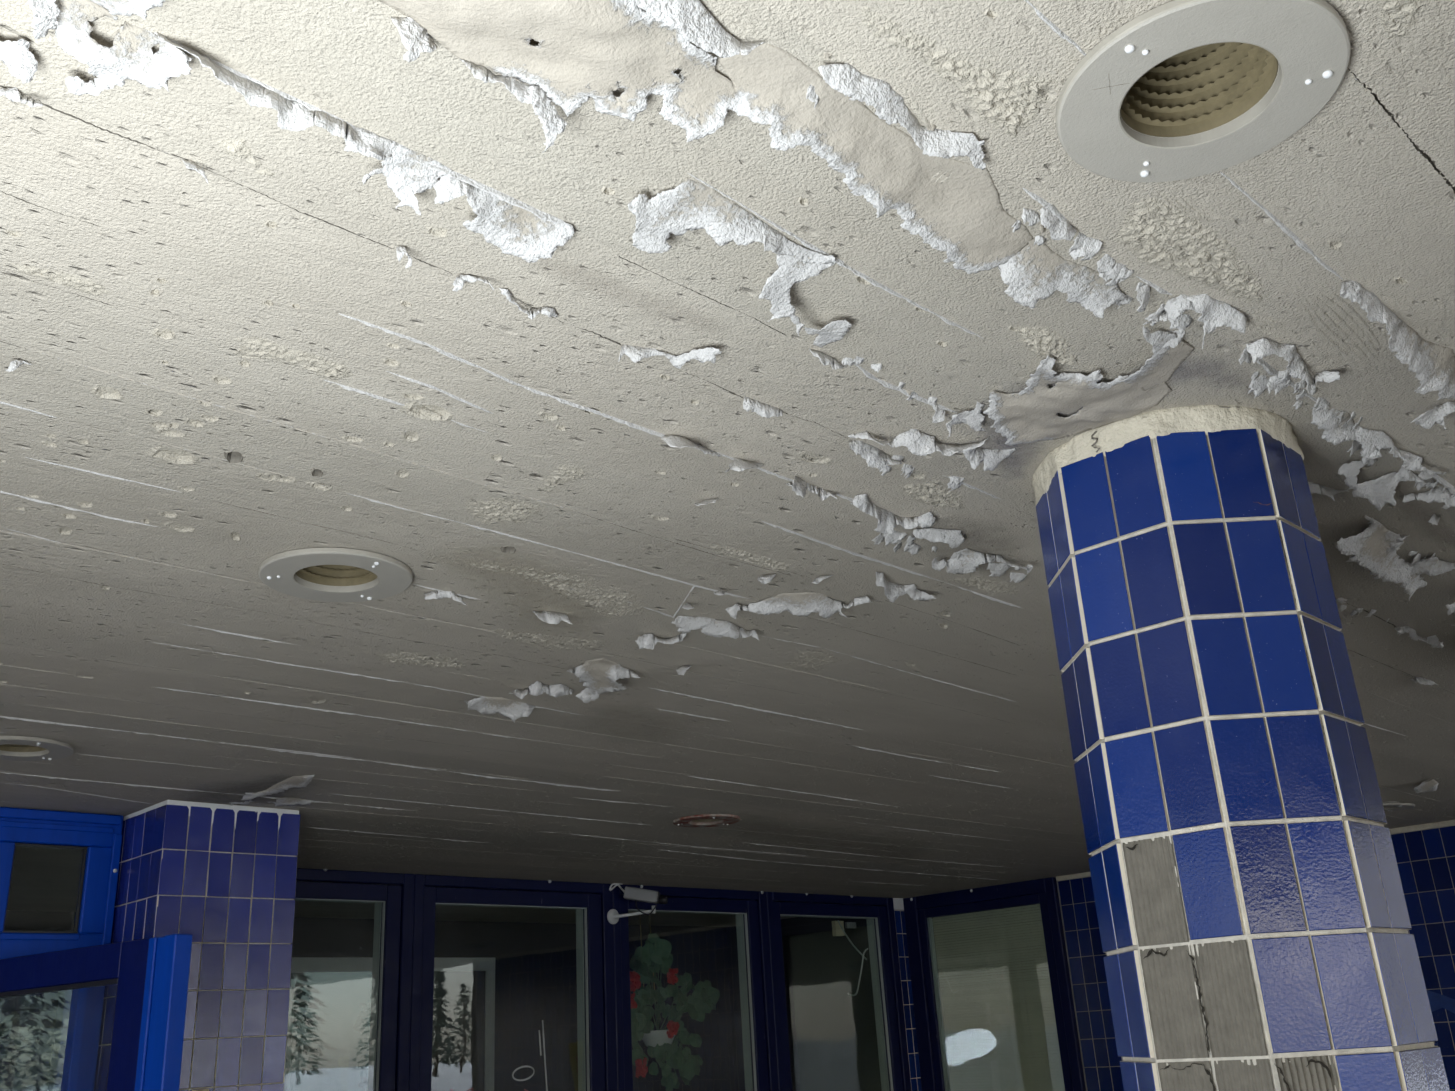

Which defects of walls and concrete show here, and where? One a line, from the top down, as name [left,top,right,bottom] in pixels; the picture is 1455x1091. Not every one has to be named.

peeling [0,0,574,263]
crack [1347,67,1455,194]
peeling [378,0,1455,601]
spalling [211,336,355,385]
spalling [144,401,220,465]
spalling [224,451,243,463]
spalling [256,468,333,491]
peeling [635,544,952,650]
peeling [464,658,640,723]
peeling [230,775,315,807]
crack [1144,949,1215,1091]
crack [1274,1059,1332,1091]